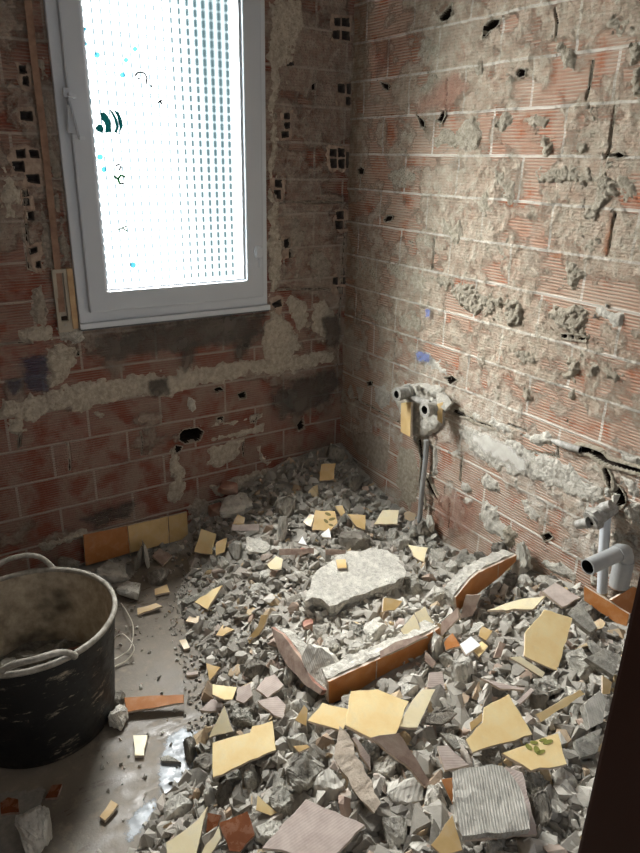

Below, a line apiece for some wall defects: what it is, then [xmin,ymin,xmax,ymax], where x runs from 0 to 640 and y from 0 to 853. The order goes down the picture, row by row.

spalling [439,2,453,23]
spalling [482,15,504,40]
spalling [511,67,527,81]
crack [601,106,617,159]
spalling [7,144,52,224]
crack [607,209,618,257]
damp [96,313,266,372]
damp [323,315,340,347]
spalling [171,425,208,456]
crack [451,406,640,492]
spalling [610,480,627,510]
spalling [540,531,554,543]